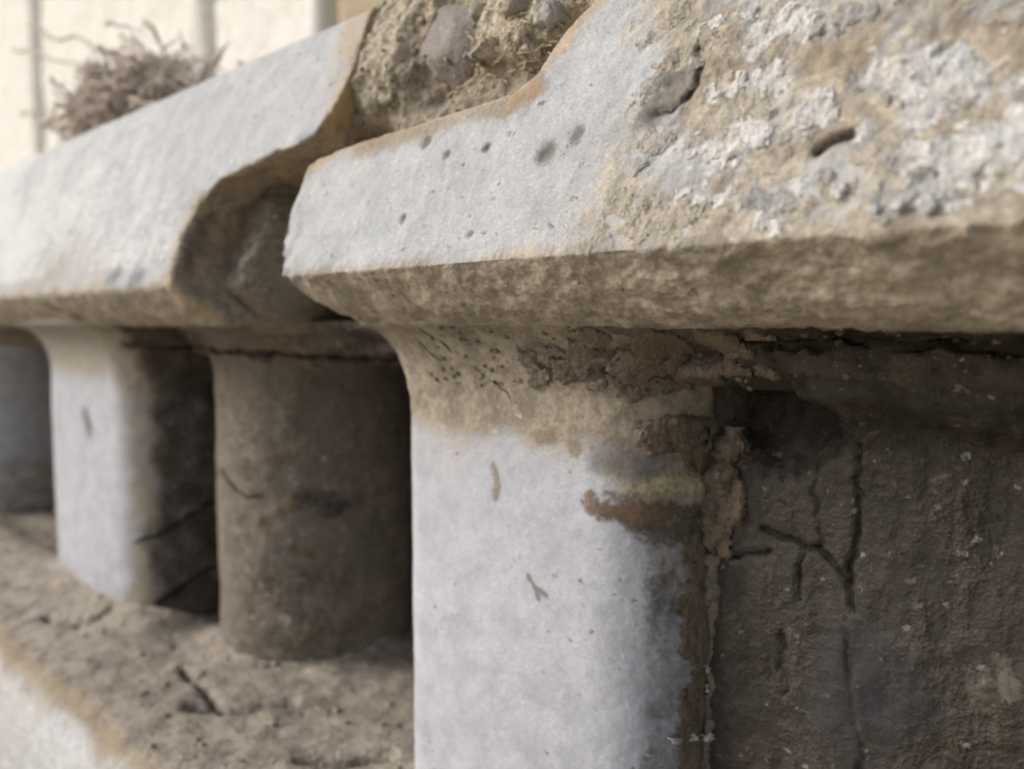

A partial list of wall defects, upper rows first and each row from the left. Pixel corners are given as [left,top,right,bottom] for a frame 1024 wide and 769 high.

peeling [833,1,884,38]
peeling [586,0,813,258]
leakage [682,0,1024,217]
peeling [737,80,1024,229]
leakage [670,178,741,213]
leakage [752,210,786,237]
spalling [516,326,781,404]
crack [134,468,263,544]
corrosion [581,472,707,547]
crack [154,565,215,606]
peeling [633,413,754,769]
crack [731,444,865,769]